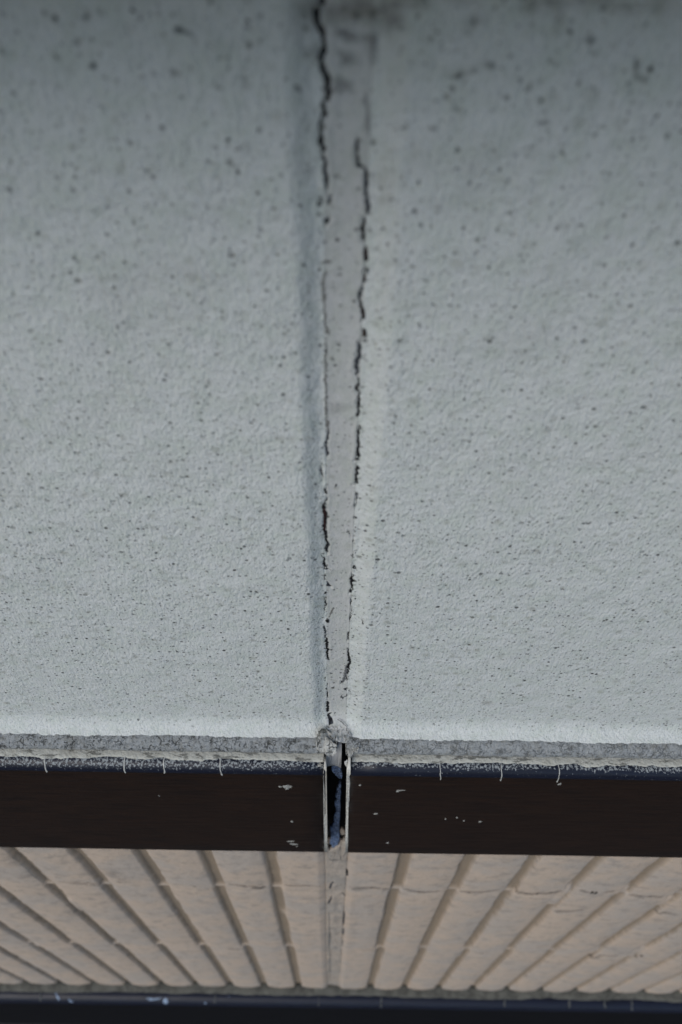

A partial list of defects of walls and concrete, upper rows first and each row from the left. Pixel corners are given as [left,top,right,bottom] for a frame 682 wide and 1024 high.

crack [299,0,371,728]
peeling [325,718,353,743]